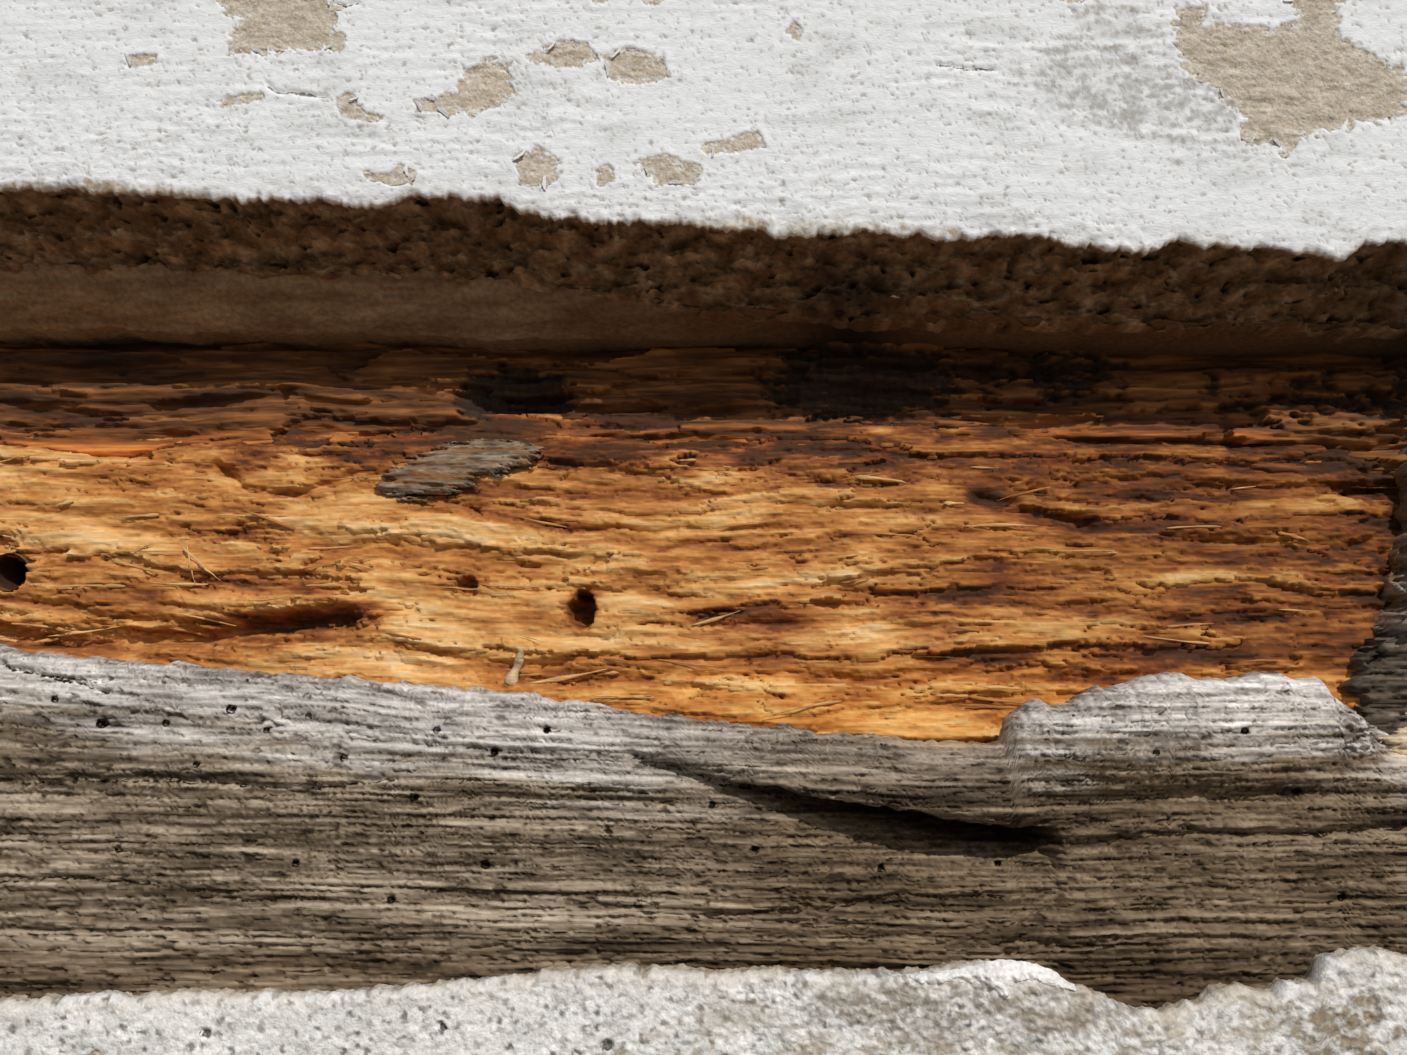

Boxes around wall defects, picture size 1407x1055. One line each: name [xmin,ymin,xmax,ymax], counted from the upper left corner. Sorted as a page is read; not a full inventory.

peeling [216,0,346,56]
peeling [413,41,671,118]
peeling [1013,0,1407,158]
peeling [596,165,615,187]
flaking render [909,959,1077,999]